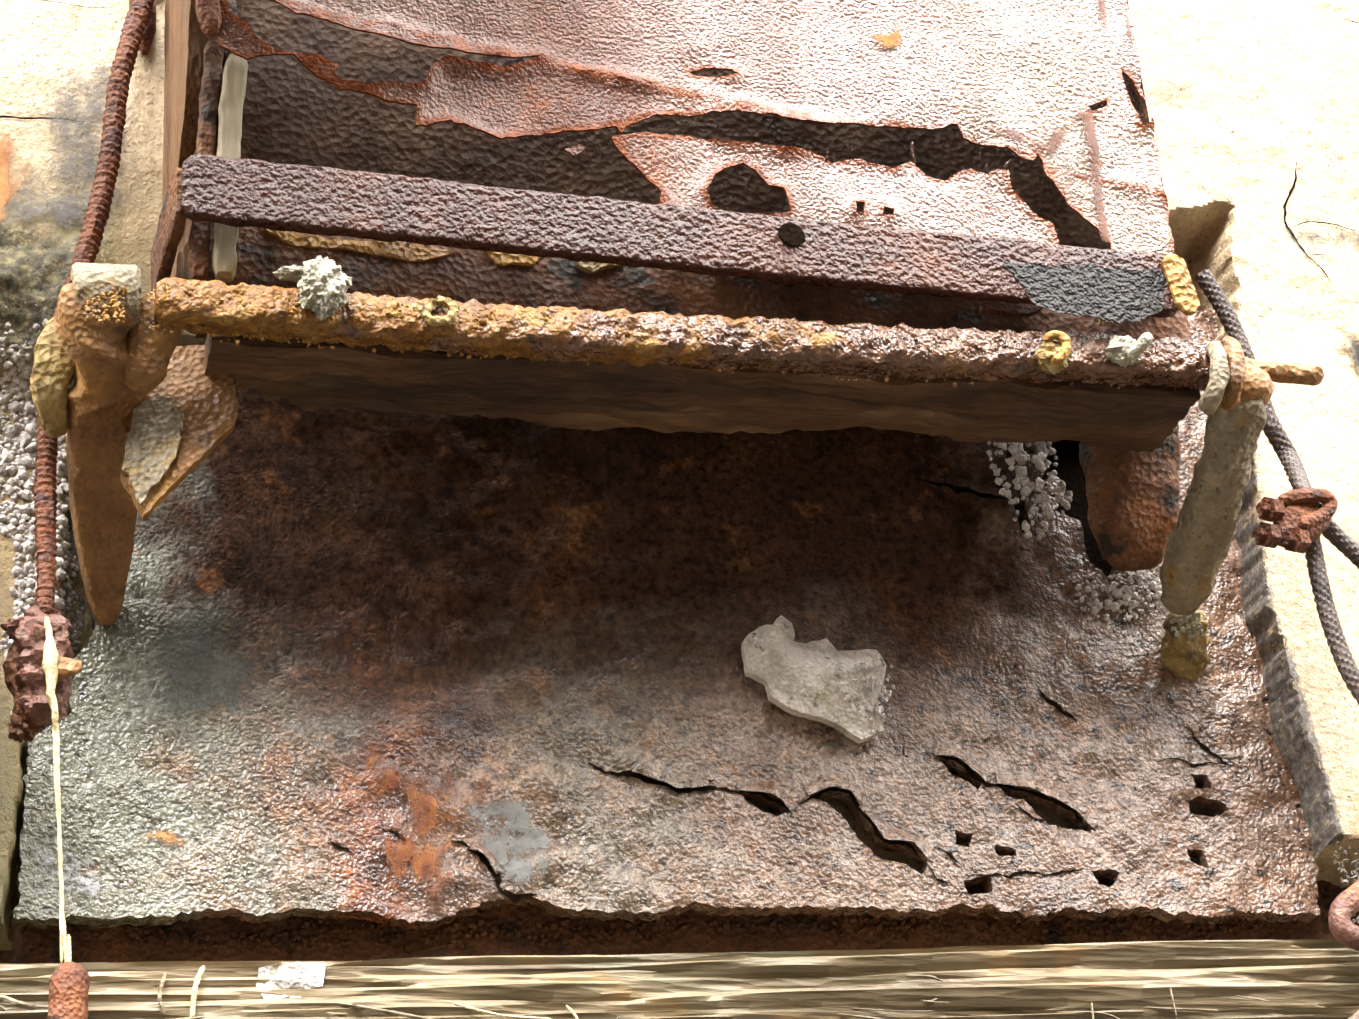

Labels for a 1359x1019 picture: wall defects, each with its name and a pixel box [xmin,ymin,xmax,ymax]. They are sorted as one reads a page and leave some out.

crack [0,115,96,123]
corrosion [564,144,586,157]
spalling [1349,339,1359,367]
corrosion [365,747,458,901]
crack [588,762,1094,884]
crack [922,745,1100,831]